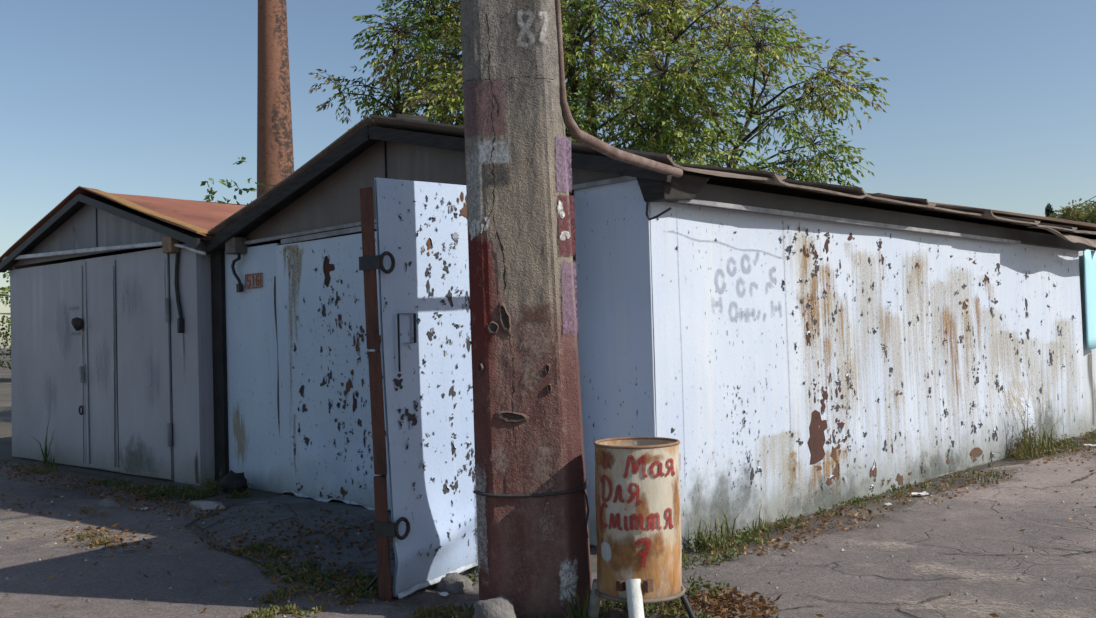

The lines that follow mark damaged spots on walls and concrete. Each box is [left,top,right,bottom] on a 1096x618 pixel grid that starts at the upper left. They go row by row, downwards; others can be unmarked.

crack [462,14,553,290]
peeling [289,250,381,499]
peeling [397,192,477,557]
peeling [487,301,552,393]
corrosion [799,240,844,373]
corrosion [941,308,959,388]